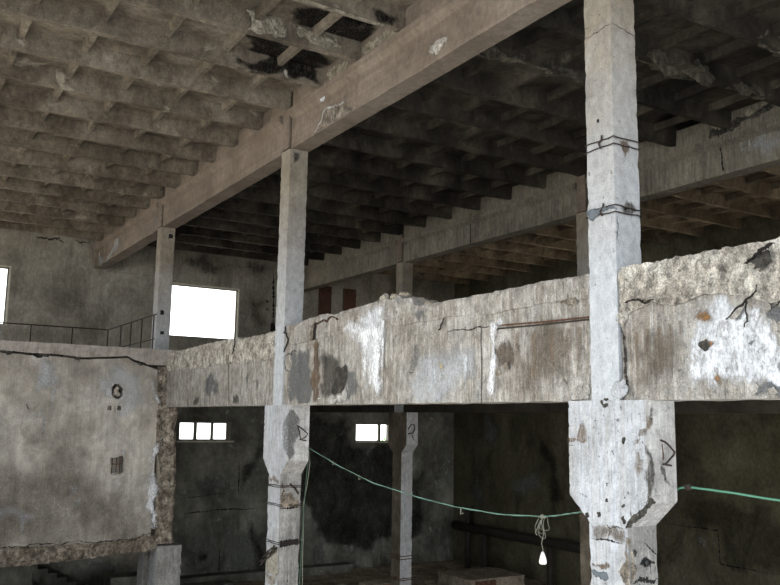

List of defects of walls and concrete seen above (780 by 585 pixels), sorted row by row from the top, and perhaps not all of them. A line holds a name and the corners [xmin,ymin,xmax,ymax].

spalling [246,10,343,48]
peeling [294,0,397,55]
spalling [636,49,716,87]
spalling [616,237,780,387]
crack [725,284,758,327]
crack [0,350,83,362]
crack [111,356,160,369]
rust [311,341,320,401]
damp [344,306,384,399]
spalling [0,274,590,567]
damp [283,350,393,564]
damp [411,482,423,538]